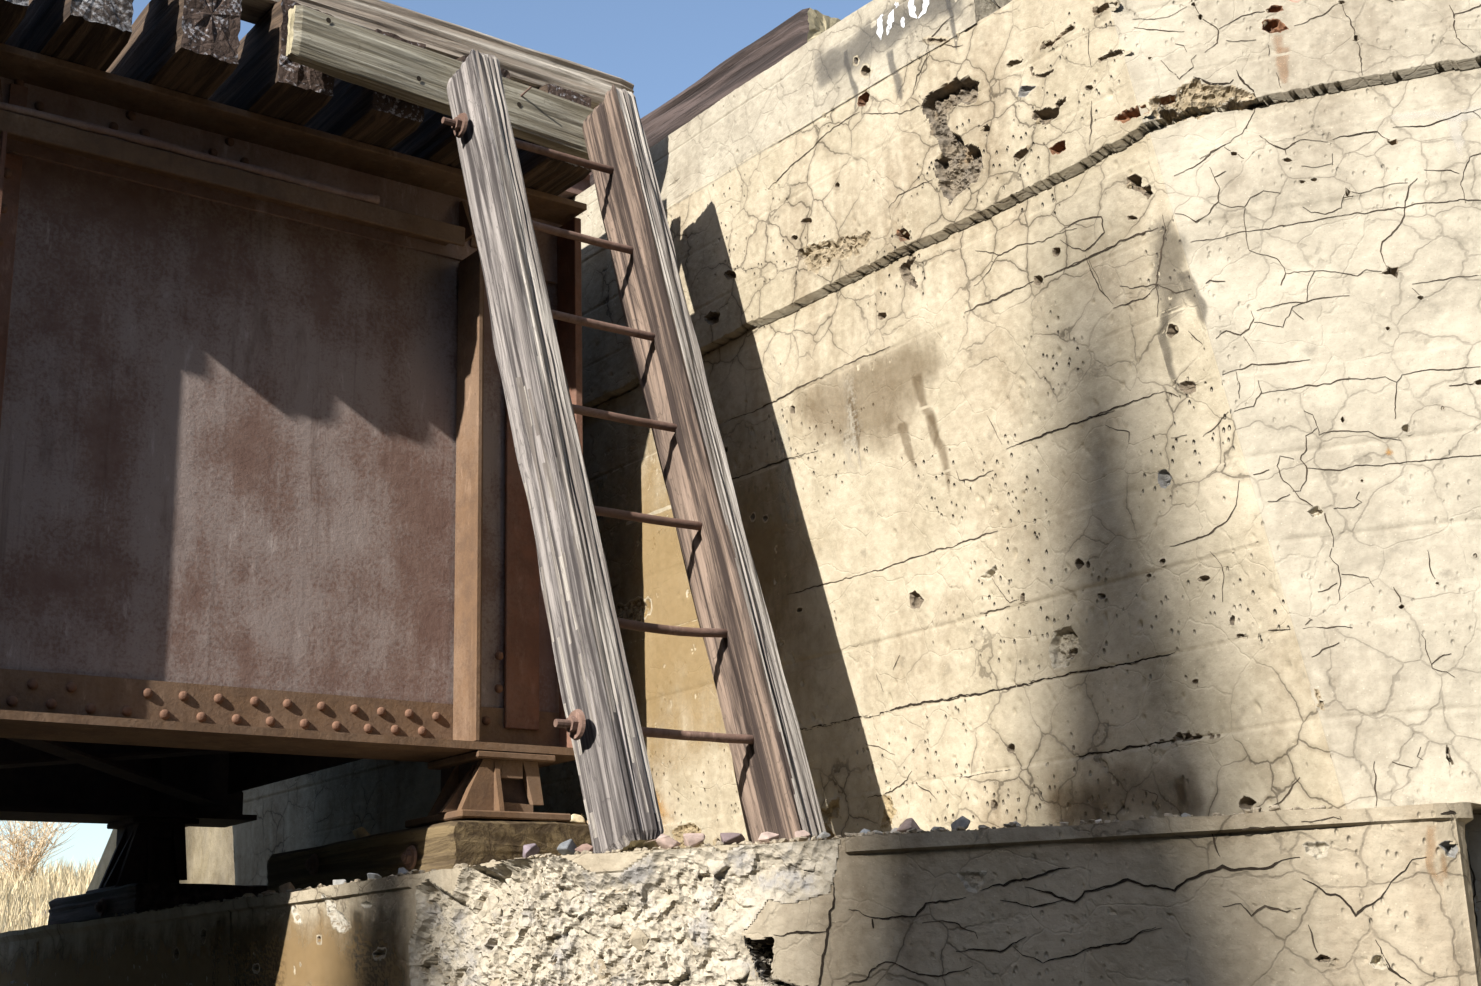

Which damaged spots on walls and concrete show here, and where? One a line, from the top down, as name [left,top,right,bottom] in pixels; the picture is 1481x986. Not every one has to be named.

crack [768,17,962,189]
spalling [919,73,992,212]
spalling [1111,75,1284,129]
crack [730,346,890,420]
spalling [799,228,873,277]
spalling [895,227,922,292]
crack [956,0,1481,657]
spalling [615,596,652,631]
crack [787,531,996,595]
crack [800,652,1175,799]
spalling [408,793,844,986]
crack [773,777,1426,986]